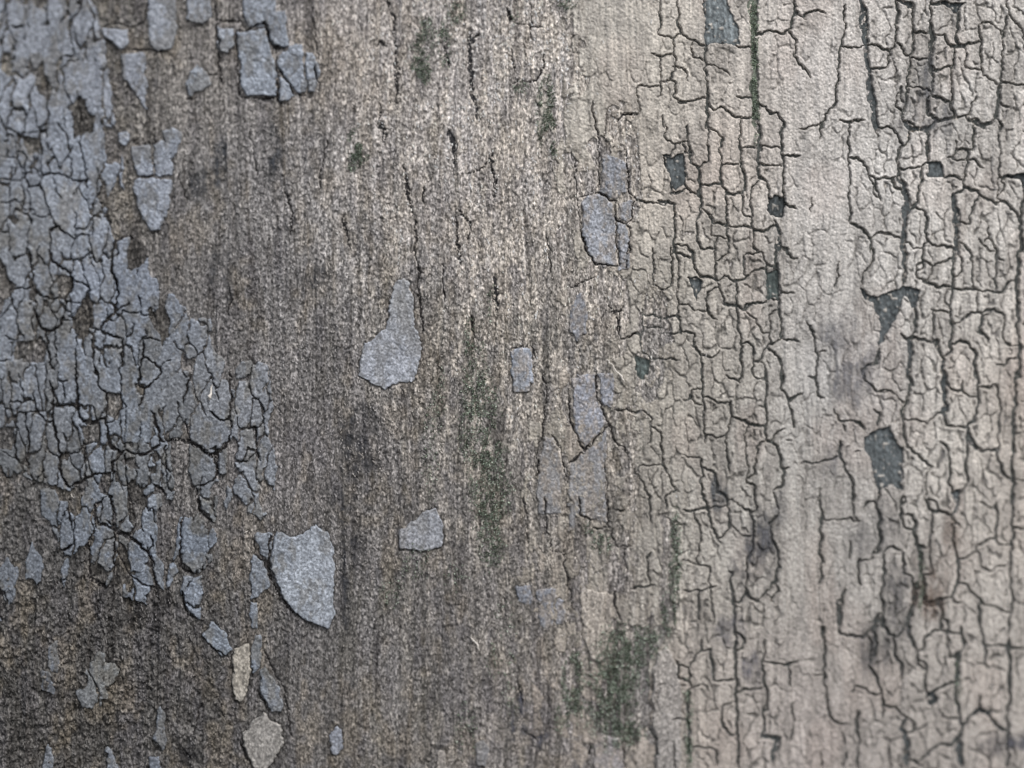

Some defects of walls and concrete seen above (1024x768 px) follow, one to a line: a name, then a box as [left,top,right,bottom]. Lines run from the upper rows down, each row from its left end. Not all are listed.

peeling [581,154,634,271]
peeling [0,0,336,768]
peeling [358,278,422,390]
crack [512,0,1024,768]
peeling [860,286,920,346]
peeling [536,373,614,532]
peeling [864,426,903,493]
peeling [398,508,444,551]